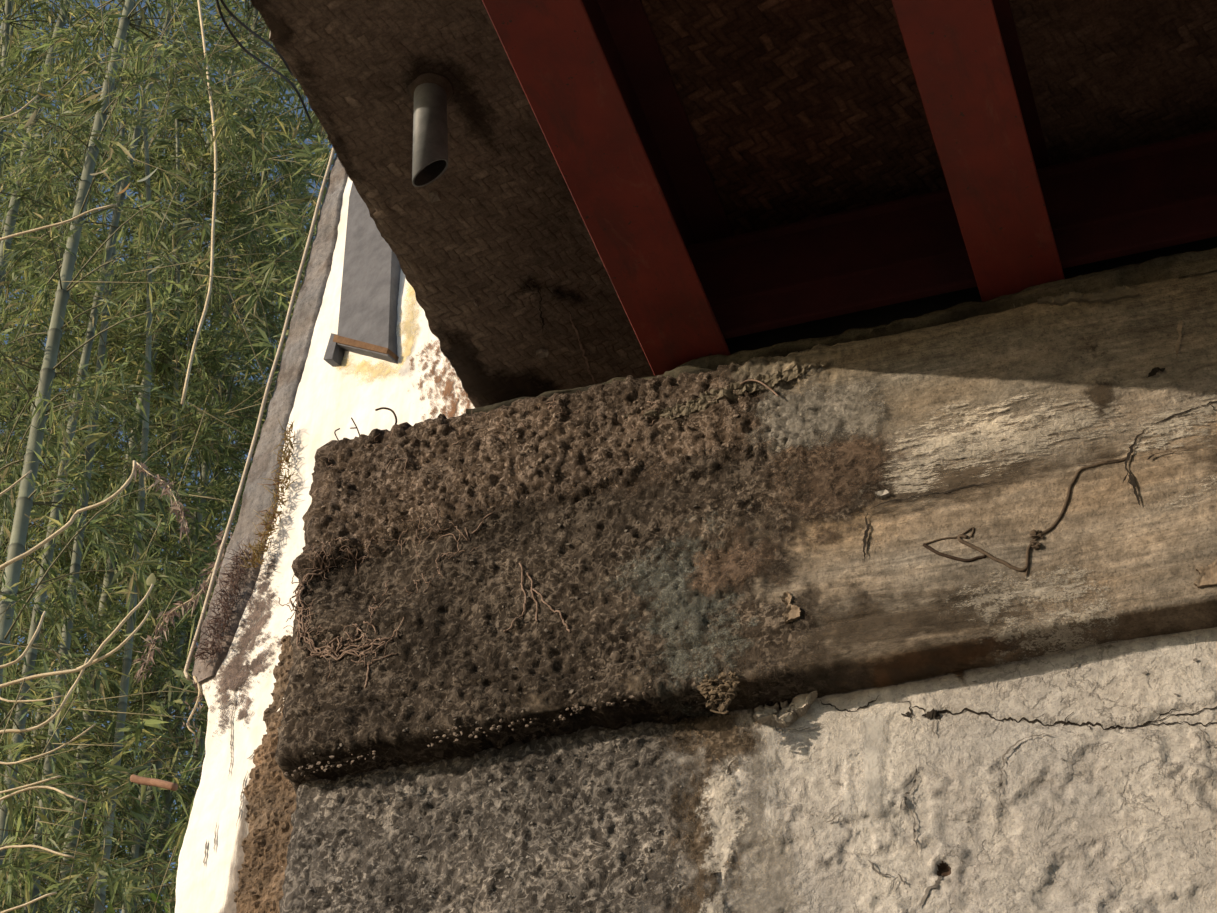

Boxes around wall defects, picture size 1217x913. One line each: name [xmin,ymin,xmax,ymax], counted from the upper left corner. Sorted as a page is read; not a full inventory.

water stain [406,58,500,151]
crack [1076,401,1217,507]
water stain [667,708,776,913]
spalling [753,691,818,729]
water stain [840,712,888,824]
crack [868,764,920,885]
crack [782,696,1217,812]